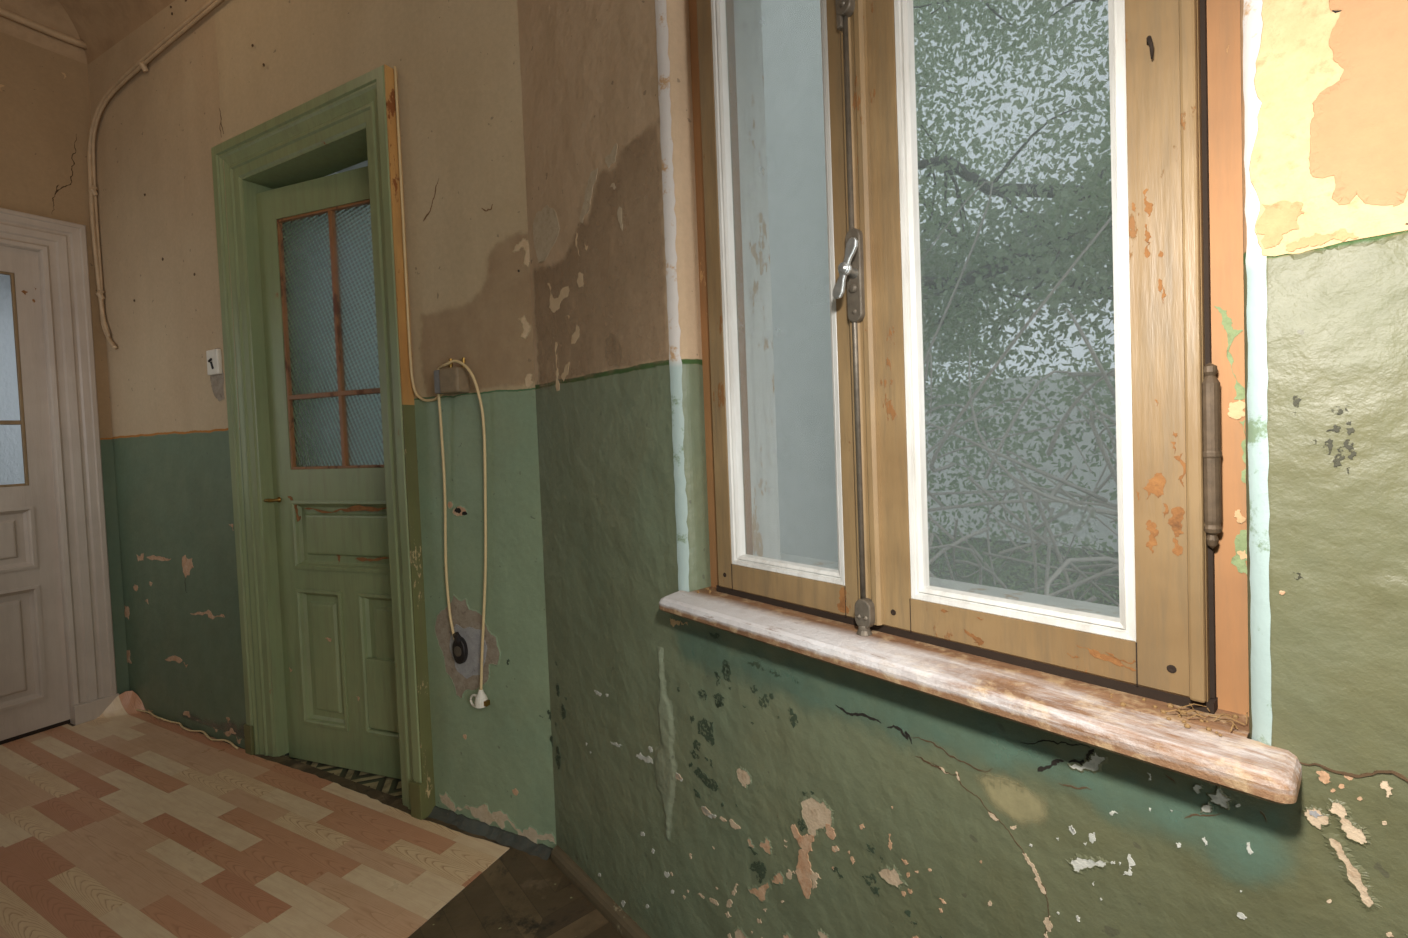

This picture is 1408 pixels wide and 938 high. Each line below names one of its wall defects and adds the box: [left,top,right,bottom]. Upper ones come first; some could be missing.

peeling [1249,0,1408,260]
crack [52,137,77,212]
damp [534,134,665,386]
peeling [136,553,194,578]
spalling [434,593,509,699]
spalling [439,792,557,846]
peeling [636,746,653,764]
spalling [664,659,932,938]
crack [1184,812,1221,820]
crack [1299,762,1408,782]